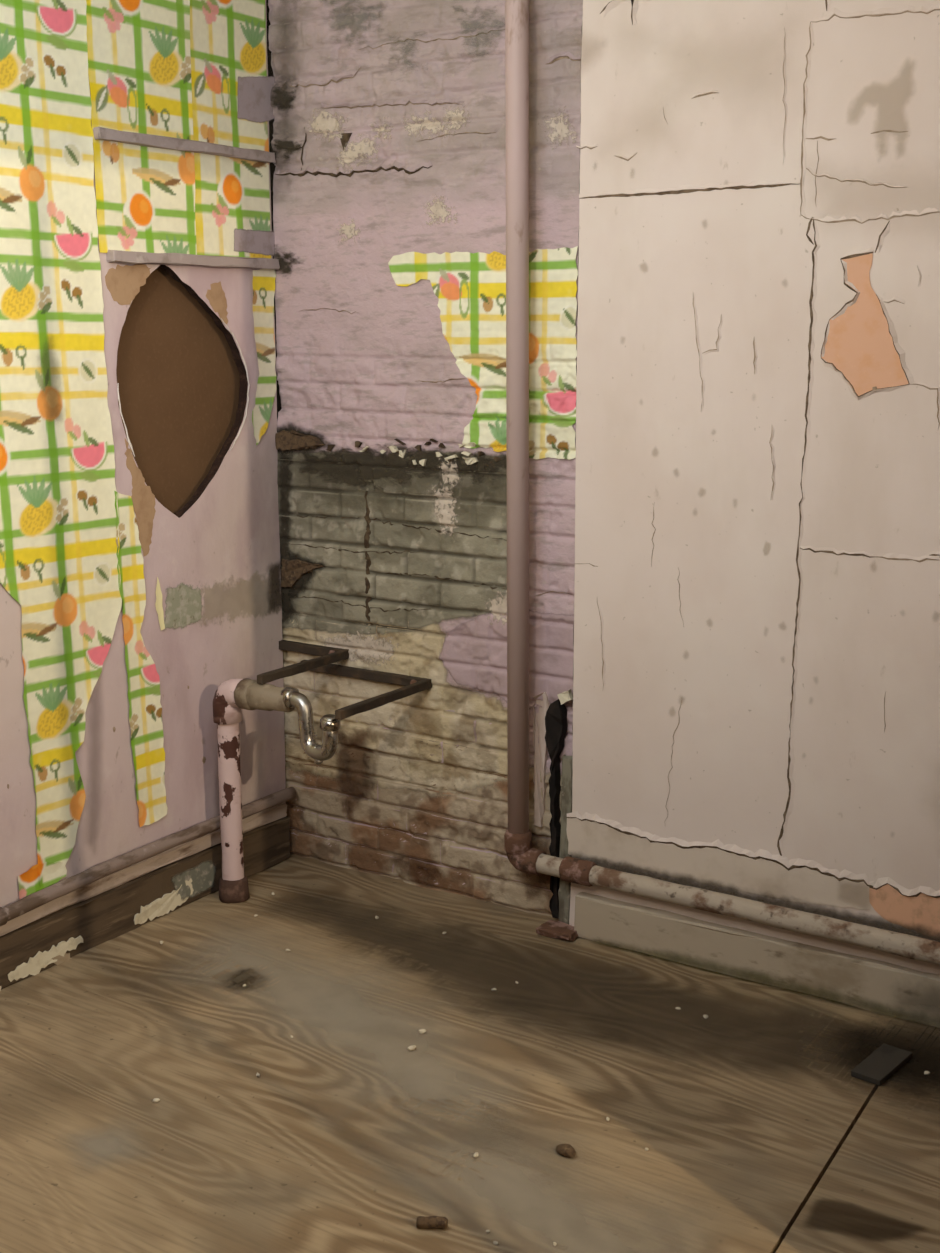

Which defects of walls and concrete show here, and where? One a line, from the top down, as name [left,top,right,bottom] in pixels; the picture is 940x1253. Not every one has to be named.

crack [274,29,505,177]
peeling [820,247,914,400]
spalling [105,264,250,557]
crack [576,0,940,858]
leakage [277,451,293,569]
leakage [281,587,294,624]
peeling [0,936,83,991]
peeling [134,878,194,925]
corrosion [522,872,551,890]
peeling [529,689,940,935]